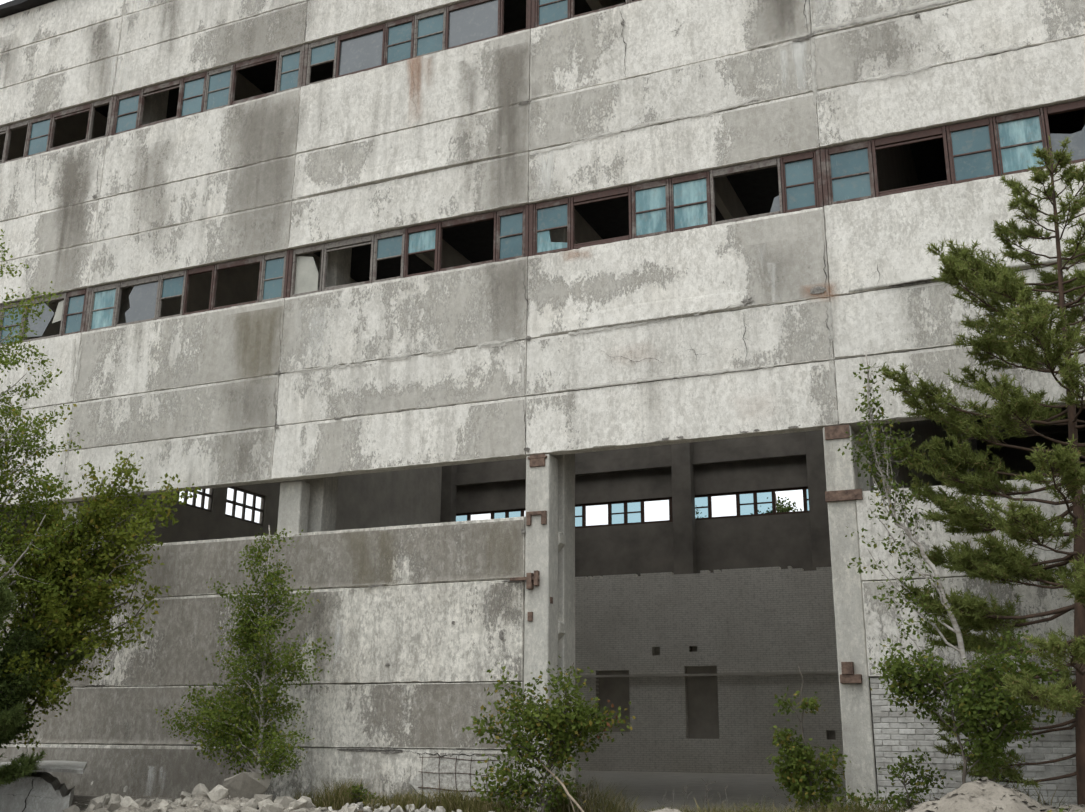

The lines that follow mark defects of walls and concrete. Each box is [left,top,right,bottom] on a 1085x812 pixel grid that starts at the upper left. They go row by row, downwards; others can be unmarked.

leakage [499,50,524,142]
leakage [62,158,87,226]
peeling [0,520,526,809]